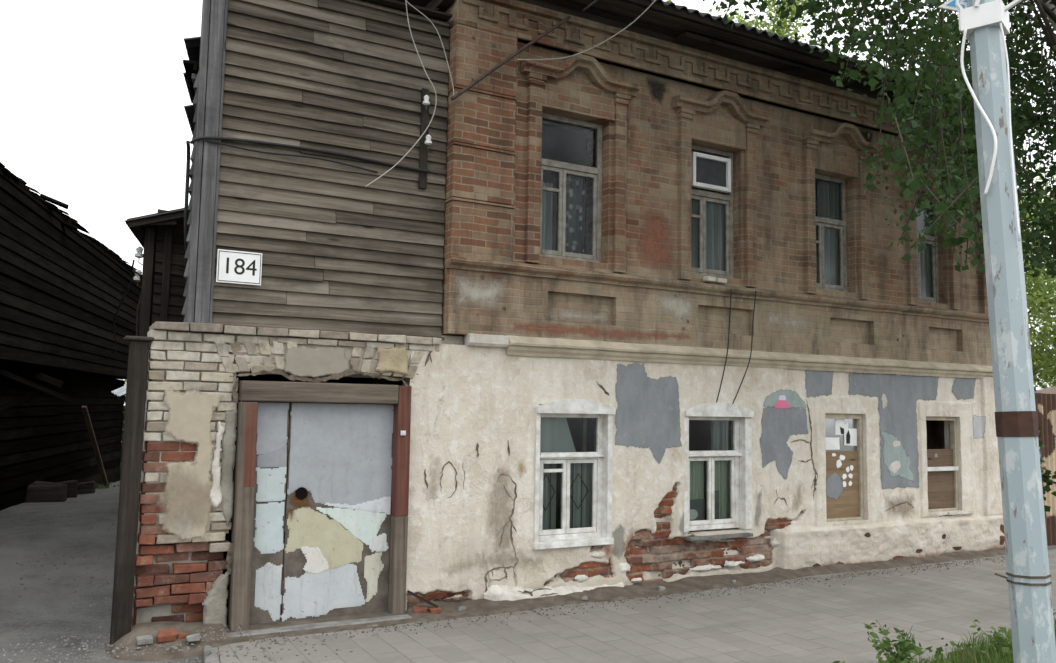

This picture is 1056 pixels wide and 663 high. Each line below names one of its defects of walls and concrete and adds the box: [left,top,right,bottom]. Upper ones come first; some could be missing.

flaking render [376,346,409,375]
peeling [1038,404,1056,436]
flaking render [163,389,224,540]
crack [424,443,479,498]
peeling [1041,449,1056,517]
crack [484,442,558,596]
flaking render [544,484,804,586]